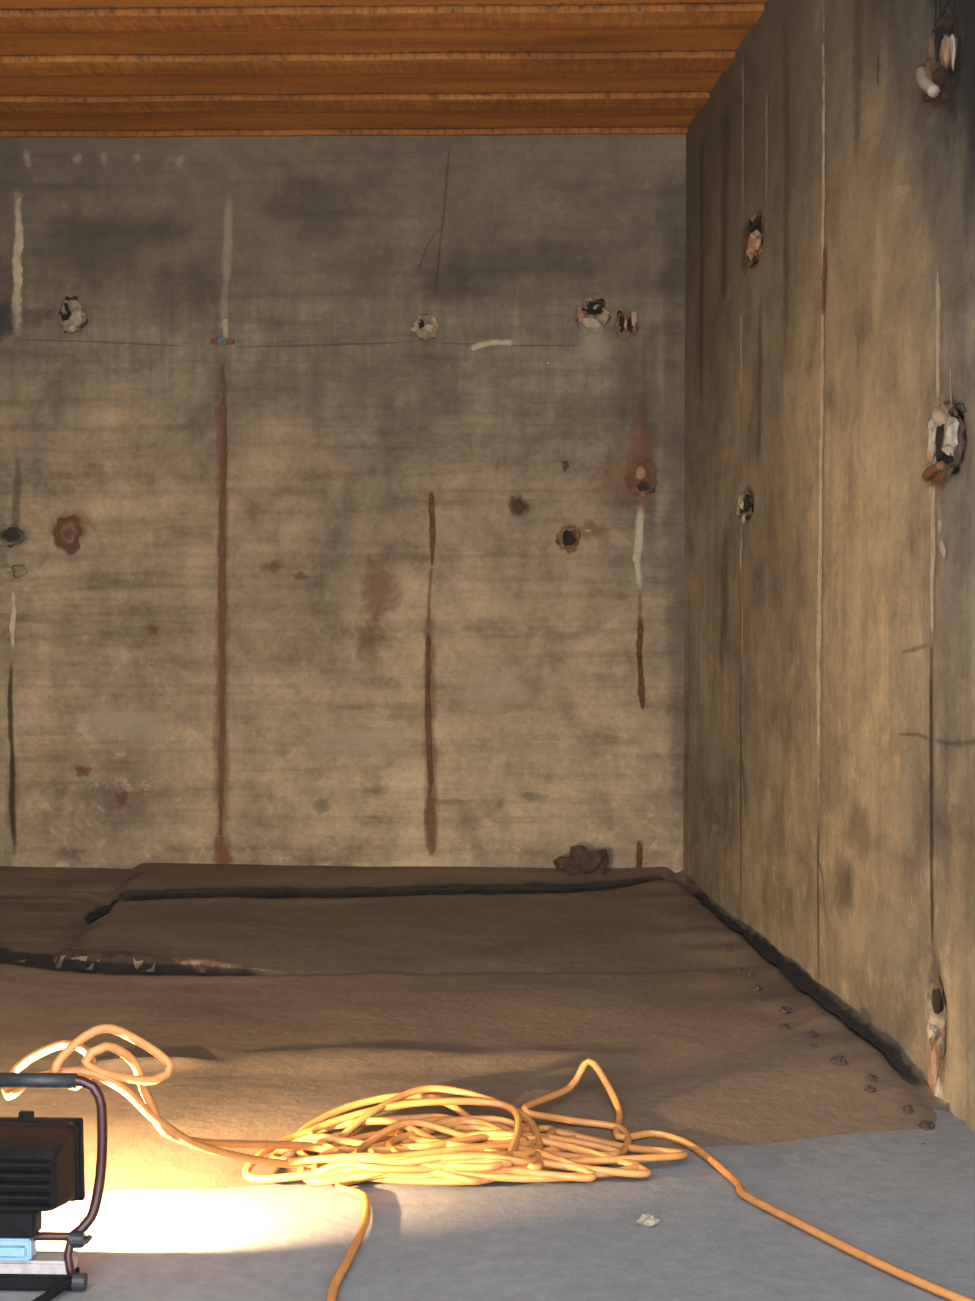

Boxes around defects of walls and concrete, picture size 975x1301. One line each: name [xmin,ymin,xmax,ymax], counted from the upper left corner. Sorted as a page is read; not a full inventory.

spalling [915,0,964,106]
water stain [0,196,24,336]
spalling [58,296,88,333]
spalling [576,297,639,341]
spalling [741,210,765,270]
water stain [816,45,826,791]
spalling [922,400,967,486]
corrosion [53,515,83,554]
corrosion [215,380,231,864]
corrosion [636,619,645,709]
corrosion [424,636,436,853]
crack [927,647,935,931]